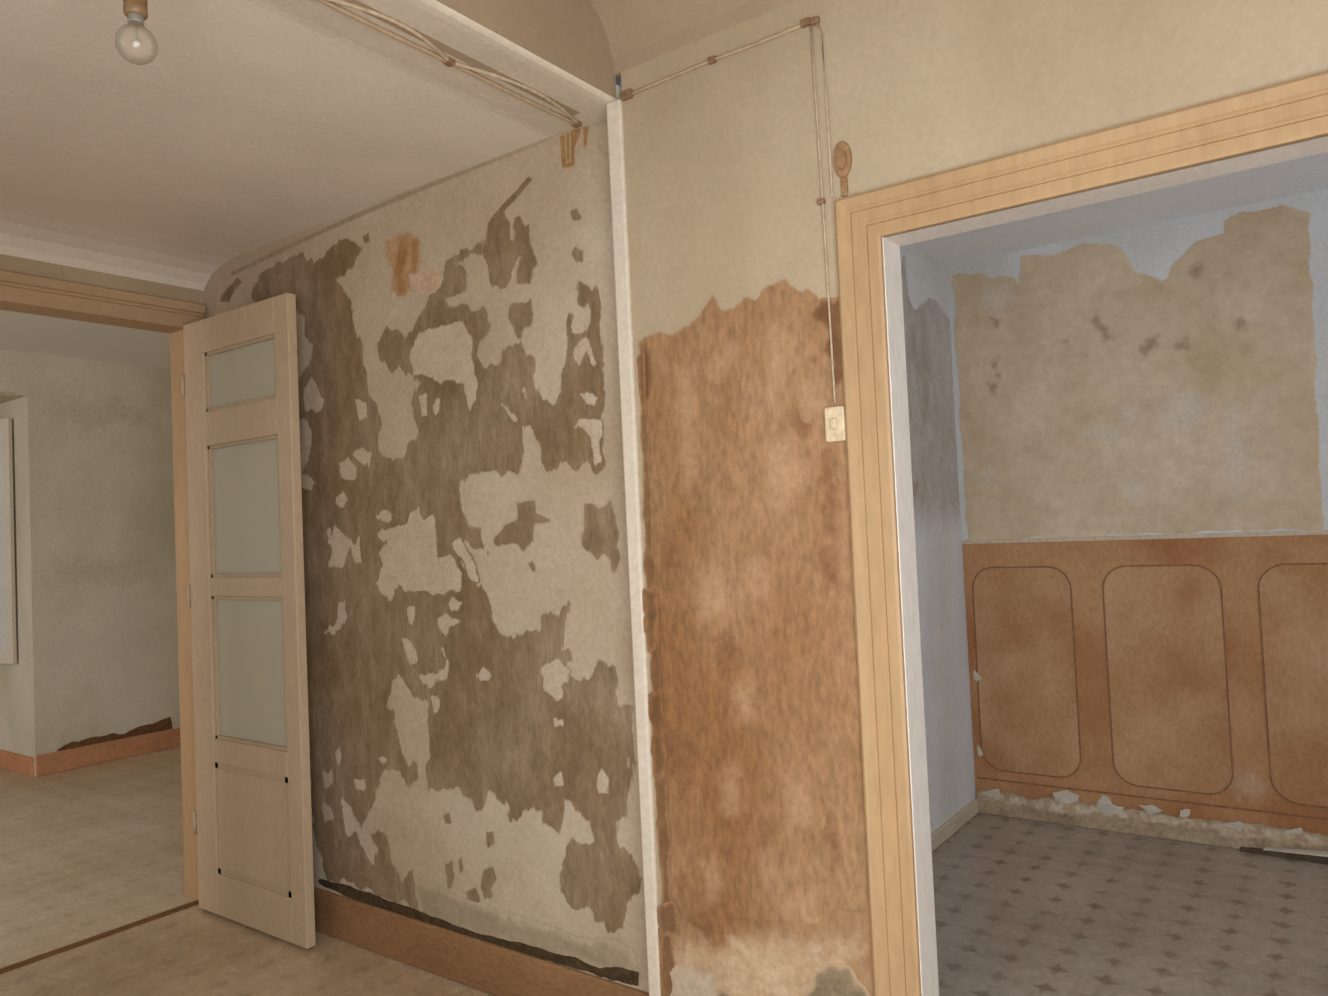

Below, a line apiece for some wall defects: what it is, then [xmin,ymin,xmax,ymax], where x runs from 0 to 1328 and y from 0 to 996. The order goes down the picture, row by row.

peeling [901,203,1326,549]
peeling [220,206,874,996]
spalling [976,789,1328,849]